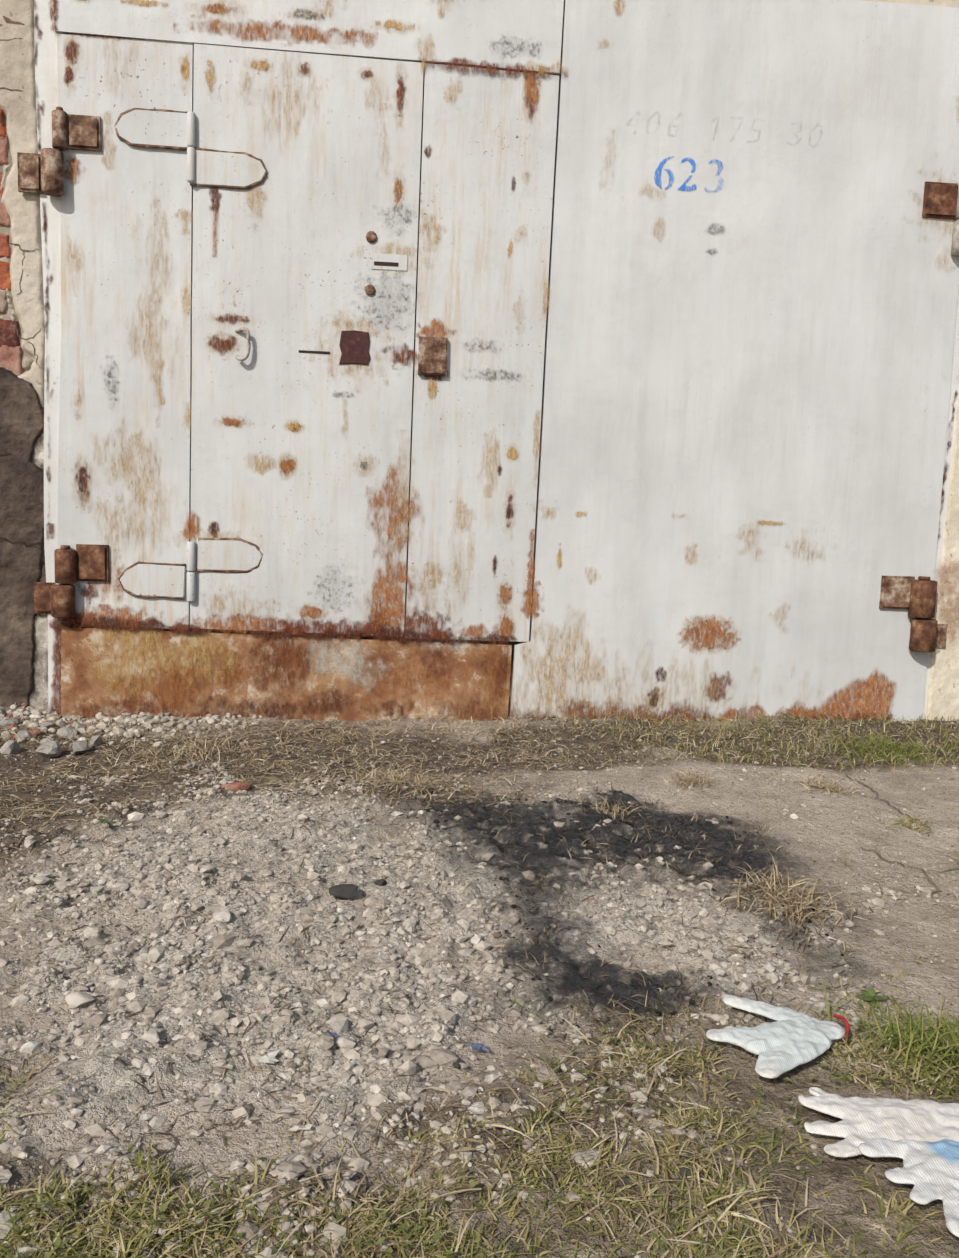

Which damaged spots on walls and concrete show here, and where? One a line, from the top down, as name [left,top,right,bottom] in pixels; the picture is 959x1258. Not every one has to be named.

crack [0,16,25,41]
rust [205,4,402,43]
rust [422,45,568,117]
rust [65,159,79,183]
flaking render [0,108,32,376]
leakage [0,367,45,707]
rust [49,467,894,724]